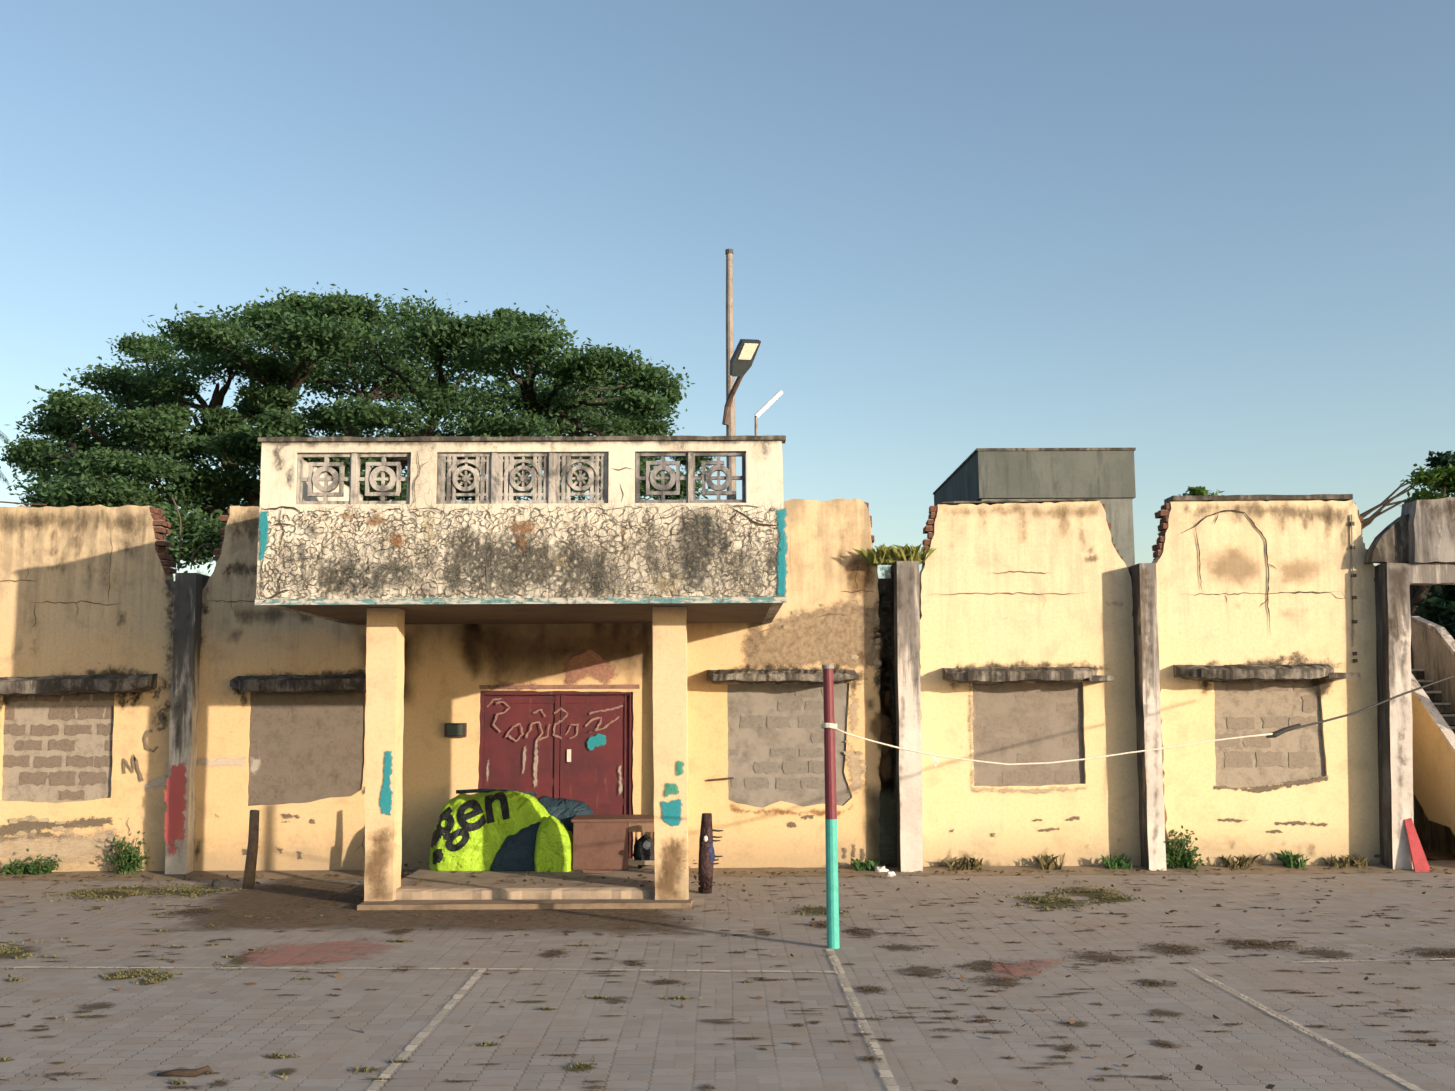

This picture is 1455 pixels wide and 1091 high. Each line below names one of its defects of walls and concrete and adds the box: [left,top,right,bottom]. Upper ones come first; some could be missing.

spalling [149,507,177,574]
leakage [299,526,411,593]
crack [204,452,780,632]
leakage [447,530,615,598]
leakage [648,512,776,588]
crack [1178,510,1346,636]
peeling [744,601,882,669]
spalling [843,694,892,793]